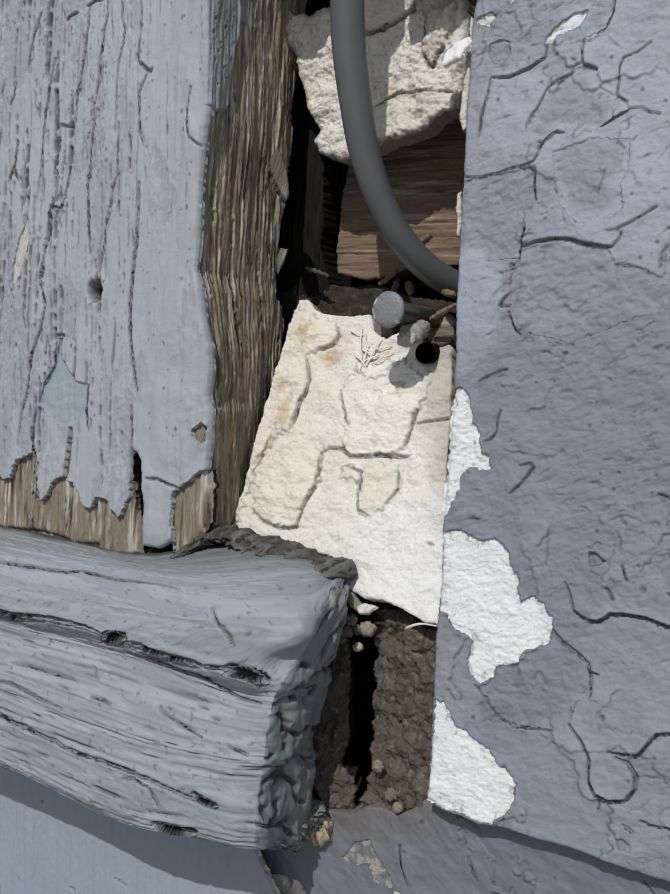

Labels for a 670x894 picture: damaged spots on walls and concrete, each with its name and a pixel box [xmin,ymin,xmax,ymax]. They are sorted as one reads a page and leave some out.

peeling [546,0,616,43]
crack [466,5,614,201]
crack [8,0,152,529]
crack [509,206,670,272]
peeling [0,338,160,553]
peeling [173,469,220,552]
crack [254,412,450,529]
peeling [440,388,592,729]
crack [0,607,270,710]
crack [0,715,219,838]
peeling [427,698,517,825]
peeling [343,839,400,894]